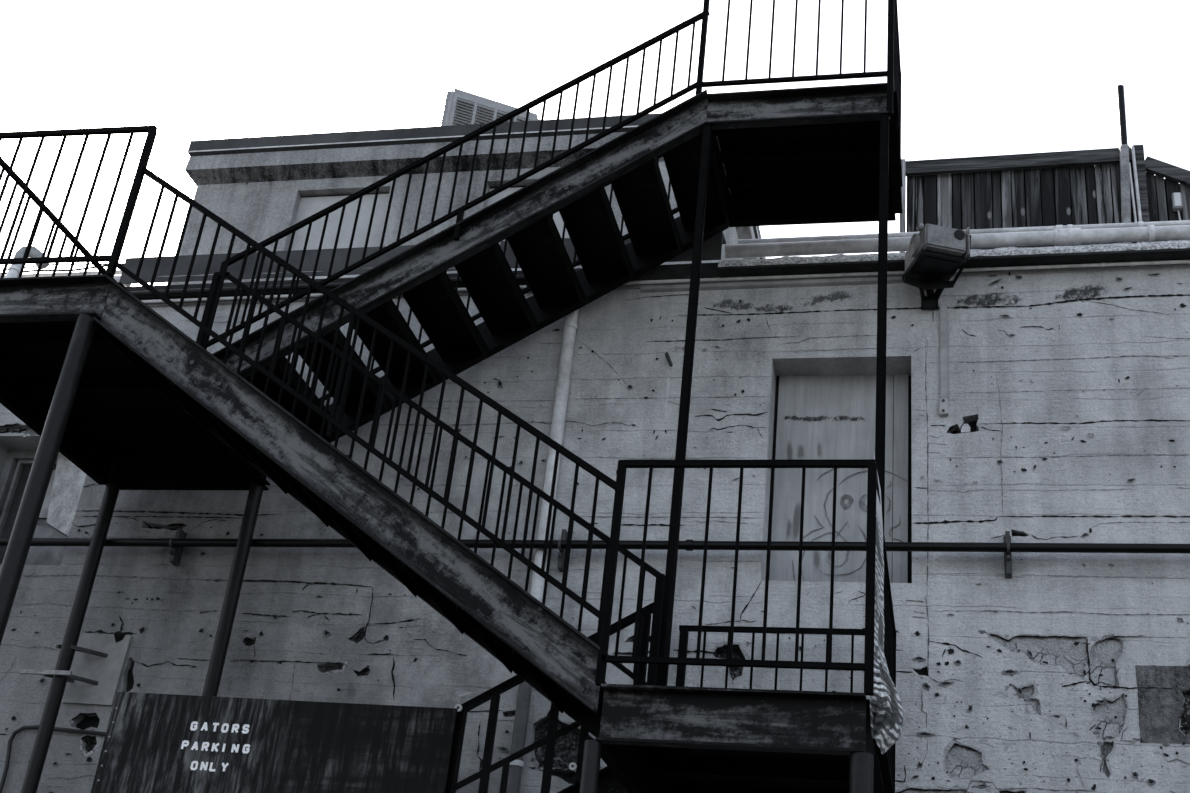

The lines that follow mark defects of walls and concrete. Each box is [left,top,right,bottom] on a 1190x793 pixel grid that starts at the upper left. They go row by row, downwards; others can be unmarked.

crack [614,294,1190,783]
spalling [53,713,102,767]
crack [22,573,468,700]
crack [468,710,503,771]
spalling [912,648,962,697]
crack [939,757,1101,793]
spalling [978,629,1156,790]
spalling [1160,659,1190,757]